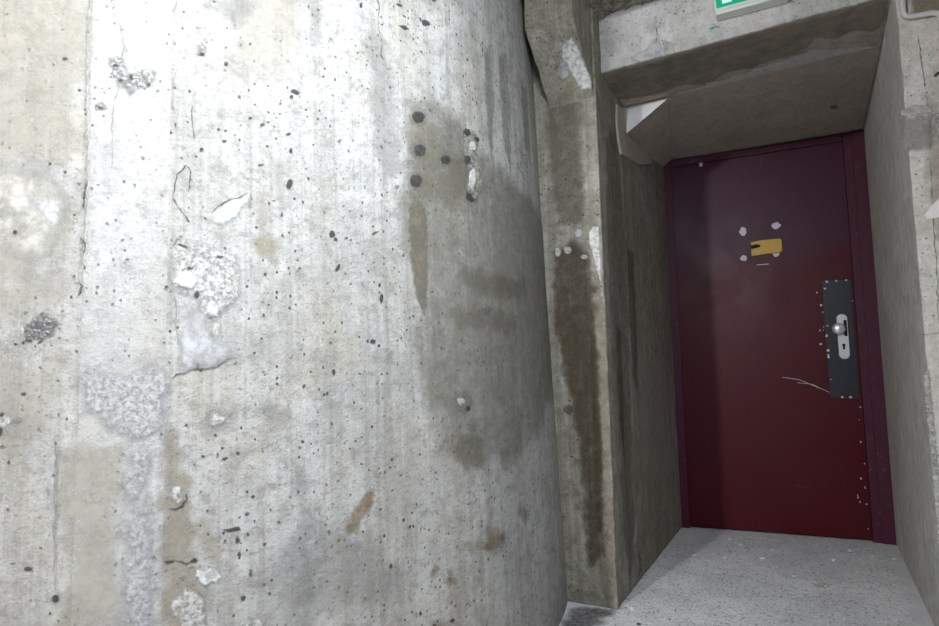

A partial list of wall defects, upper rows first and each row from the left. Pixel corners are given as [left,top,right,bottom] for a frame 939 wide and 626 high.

spalling [109,56,154,94]
spalling [464,129,482,199]
spalling [165,238,239,316]
water stain [409,197,428,313]
spalling [20,316,58,344]
water stain [554,242,615,598]
corrosion [349,493,372,531]
spalling [171,568,221,626]